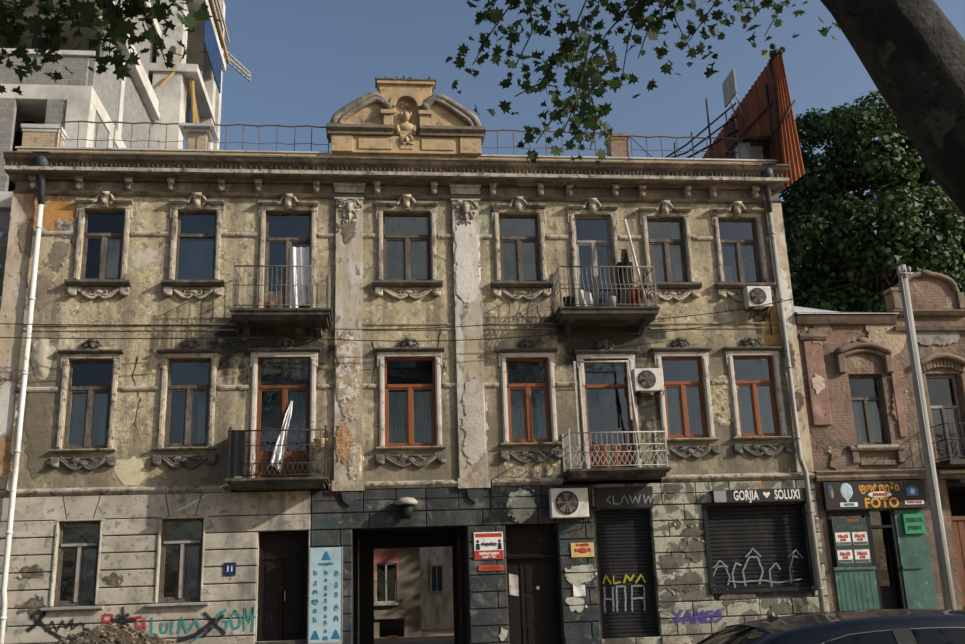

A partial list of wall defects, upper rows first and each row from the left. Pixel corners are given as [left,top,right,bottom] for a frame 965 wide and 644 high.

peeling [0,366,19,482]
crack [127,357,149,440]
peeling [334,332,364,480]
peeling [461,374,489,467]
peeling [812,373,825,394]
spalling [503,452,561,523]
spalling [19,564,44,584]
peeling [564,564,597,612]
peeling [658,518,706,611]
peeling [719,592,762,606]